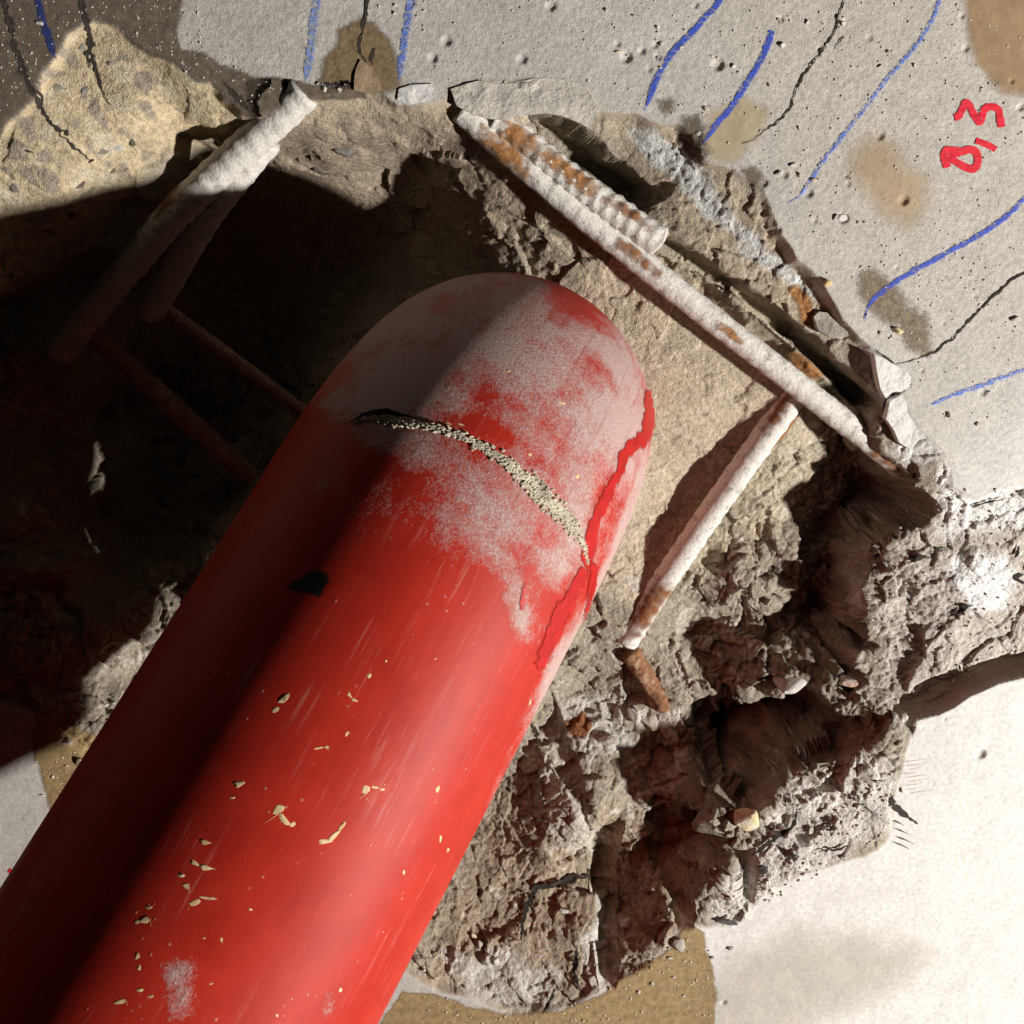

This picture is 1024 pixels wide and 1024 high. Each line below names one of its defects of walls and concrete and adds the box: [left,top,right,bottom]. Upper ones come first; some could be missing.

crack [0,0,89,160]
crack [78,0,112,105]
water stain [0,0,401,135]
rust [708,103,763,157]
crack [742,1,845,144]
spalling [0,20,317,736]
rust [786,285,813,325]
rust [789,352,822,380]
water stain [859,269,933,356]
crack [876,272,1024,412]
spalling [138,59,946,1016]
spalling [867,455,1024,753]